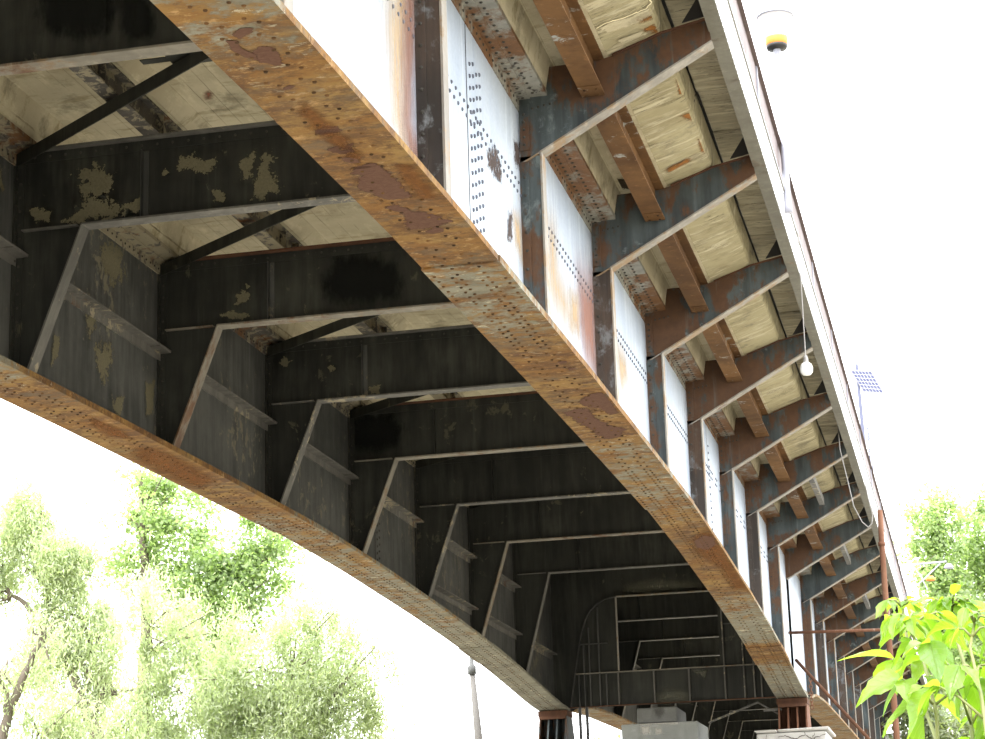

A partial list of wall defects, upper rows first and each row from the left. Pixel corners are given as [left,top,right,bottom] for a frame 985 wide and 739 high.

damp [40,0,153,39]
corrosion [392,0,417,156]
peeling [29,161,140,227]
peeling [162,150,218,176]
peeling [212,188,226,203]
peeling [239,148,285,201]
corrosion [550,240,596,366]
corrosion [692,532,748,590]